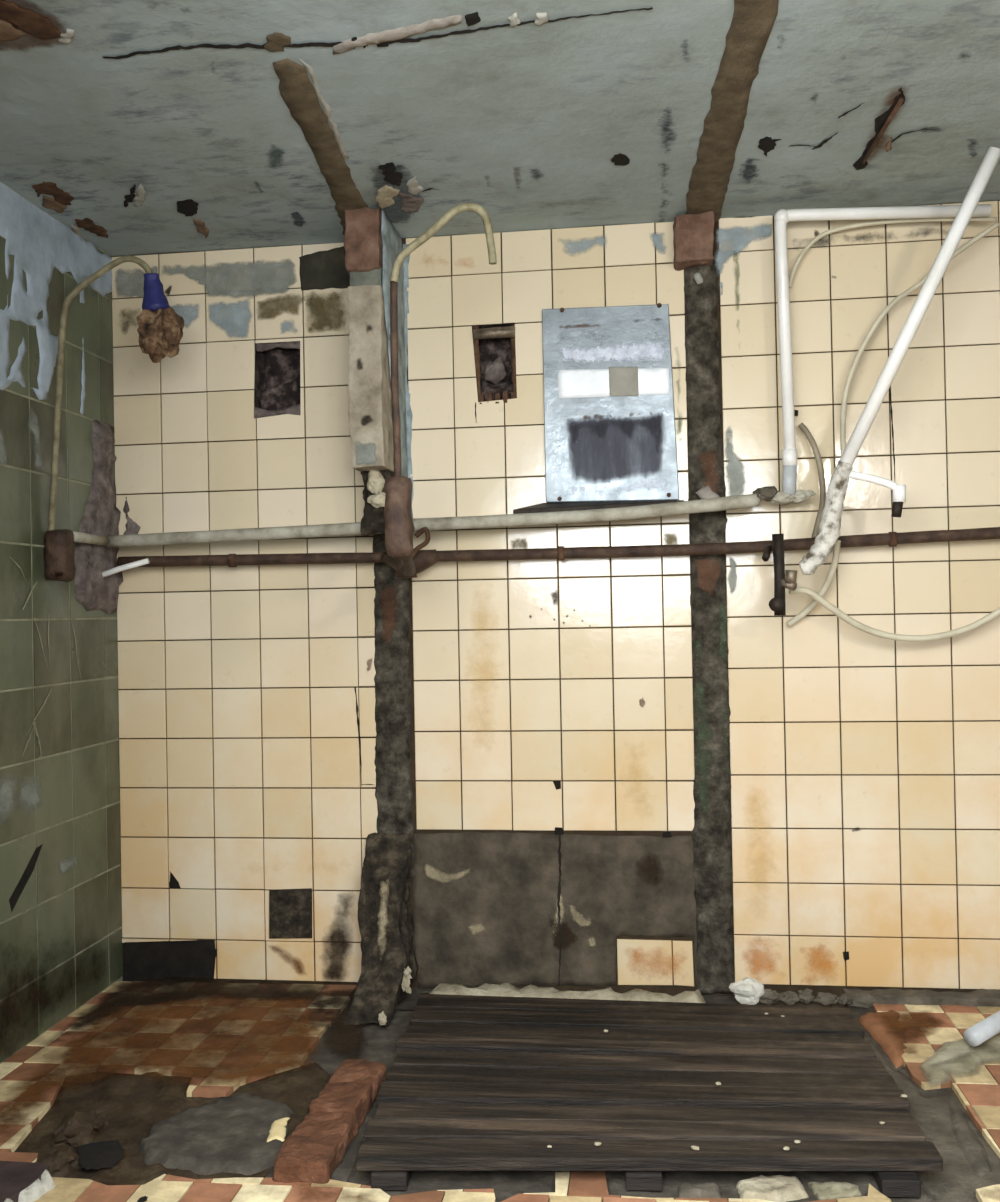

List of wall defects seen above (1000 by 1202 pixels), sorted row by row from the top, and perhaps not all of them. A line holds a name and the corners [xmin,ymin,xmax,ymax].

spalling [264,32,291,52]
crack [103,7,653,59]
peeling [299,59,350,159]
peeling [270,149,284,167]
peeling [291,212,305,226]
peeling [0,182,301,468]
peeling [269,888,313,939]
leakage [0,899,364,1129]